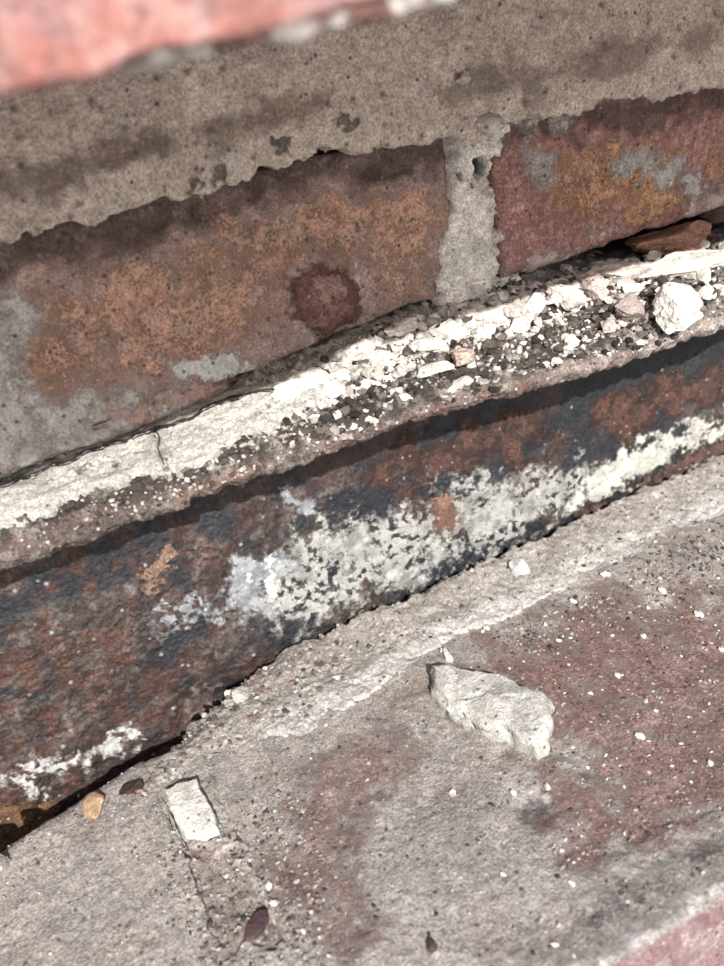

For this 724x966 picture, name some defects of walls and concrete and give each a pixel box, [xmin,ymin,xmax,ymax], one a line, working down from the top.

crack [0,325,361,488]
rust [590,357,724,447]
rust [361,406,560,536]
rust [637,435,724,487]
peeling [263,417,724,642]
rust [573,496,608,519]
rust [137,544,185,596]
rust [119,780,144,795]
rust [0,795,62,852]